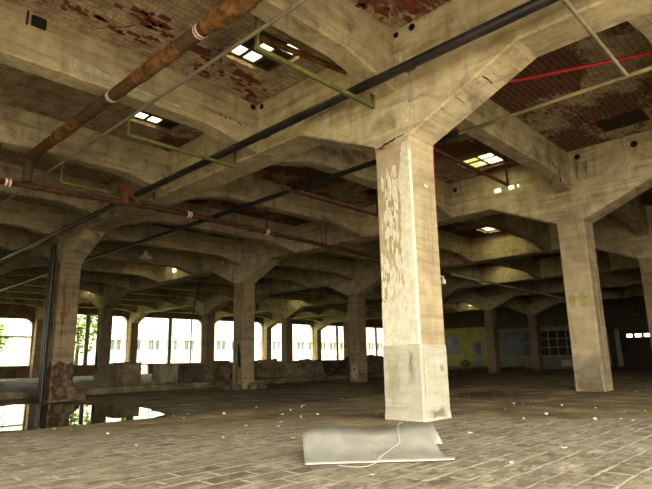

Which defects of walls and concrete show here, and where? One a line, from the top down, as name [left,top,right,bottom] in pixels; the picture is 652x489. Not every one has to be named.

peeling [60,0,175,46]
peeling [355,0,391,21]
peeling [402,0,432,23]
peeling [189,45,269,98]
peeling [380,140,421,346]
spalling [44,361,88,402]